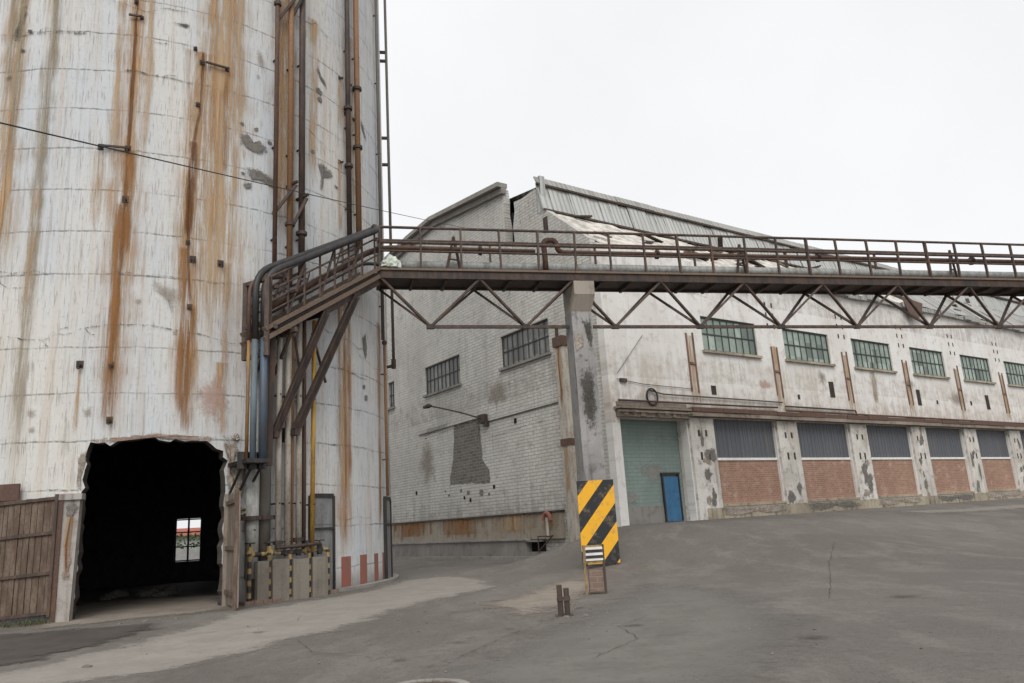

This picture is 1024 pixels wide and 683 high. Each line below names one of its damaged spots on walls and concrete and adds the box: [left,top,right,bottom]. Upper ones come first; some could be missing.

rust [0,0,28,238]
spalling [240,122,272,153]
rust [13,0,58,416]
rust [94,0,154,414]
rust [176,0,245,431]
spalling [241,167,273,188]
rust [339,306,352,533]
flaking render [427,419,490,497]
flaking render [700,432,717,506]
spalling [807,460,874,511]
rust [394,514,533,536]